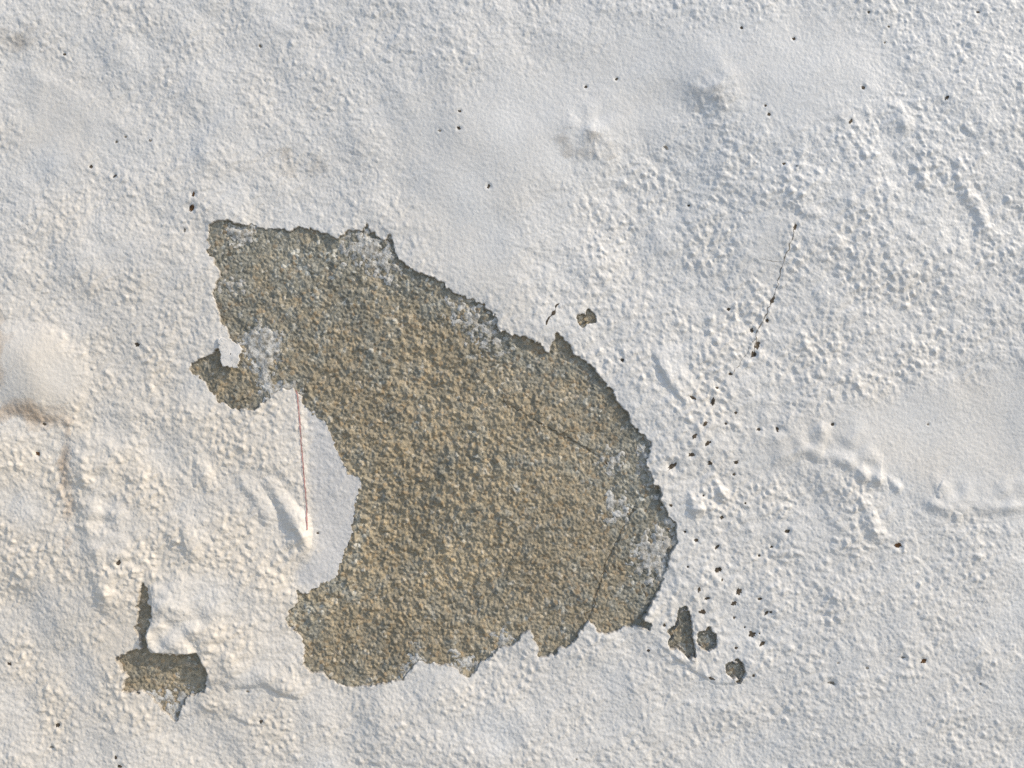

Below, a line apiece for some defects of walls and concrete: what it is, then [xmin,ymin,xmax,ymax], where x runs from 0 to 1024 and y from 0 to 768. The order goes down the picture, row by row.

crack [734,224,797,371]
peeling [190,220,678,687]
peeling [117,567,278,721]
peeling [667,606,716,657]
peeling [725,659,744,683]